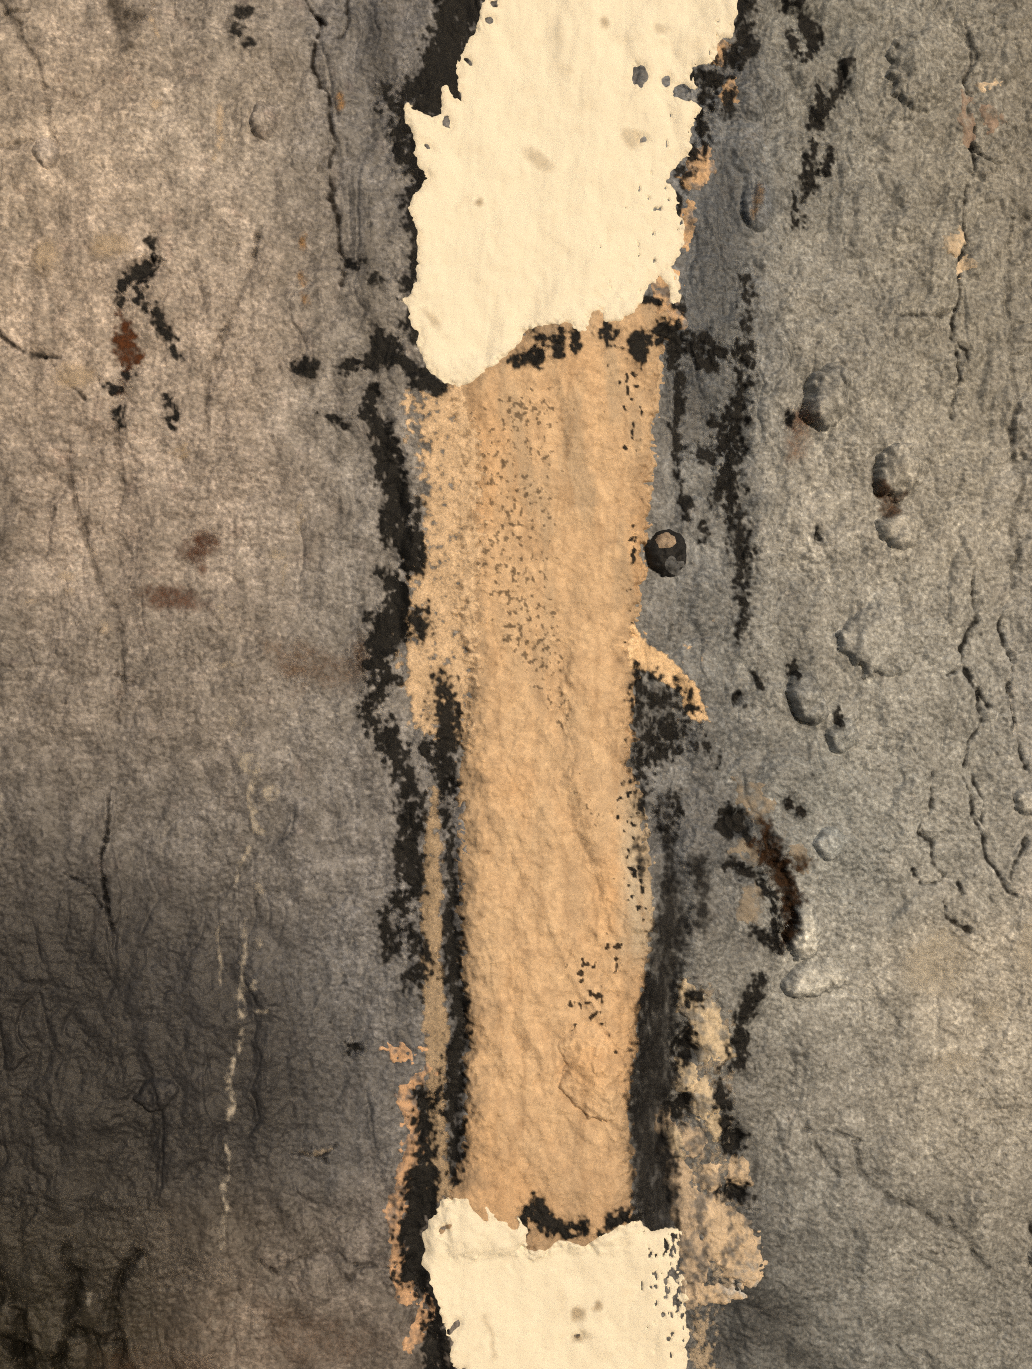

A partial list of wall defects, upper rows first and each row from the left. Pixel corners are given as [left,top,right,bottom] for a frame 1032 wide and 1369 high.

water stain [99,371,138,428]
rust [112,311,145,372]
water stain [114,236,183,360]
crack [305,0,348,287]
spalling [676,145,717,252]
water stain [316,0,497,1369]
flaking render [446,268,688,1251]
water stain [517,660,784,1253]
crack [911,788,970,933]
crack [951,581,1026,896]
spalling [379,1042,439,1354]
spalling [654,978,768,1310]